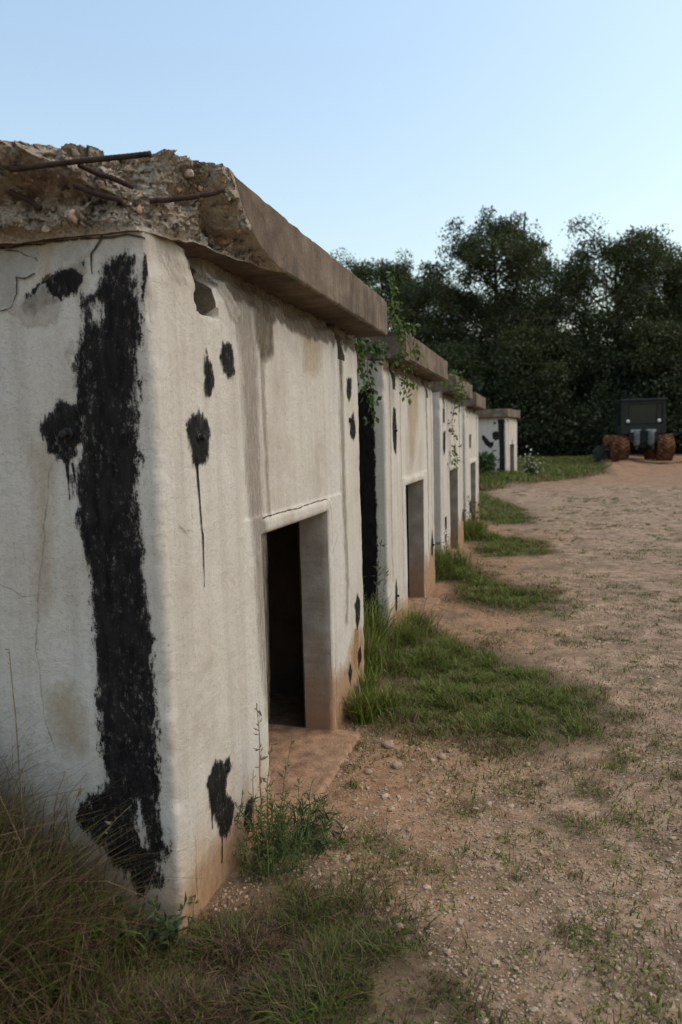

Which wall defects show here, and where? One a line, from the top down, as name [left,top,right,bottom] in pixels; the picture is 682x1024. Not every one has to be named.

spalling [9,151,152,203]
spalling [149,187,226,204]
crack [0,233,145,312]